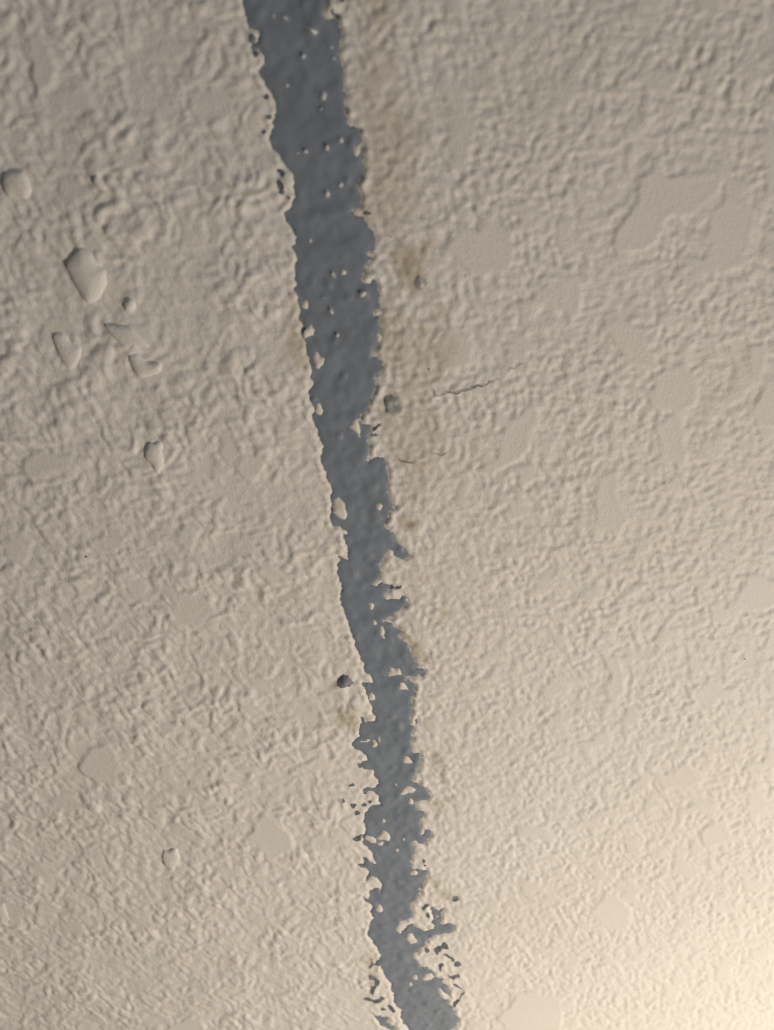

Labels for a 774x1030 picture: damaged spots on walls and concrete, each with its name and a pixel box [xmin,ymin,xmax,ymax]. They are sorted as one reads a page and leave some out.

peeling [243,0,465,1030]
crack [433,363,524,396]